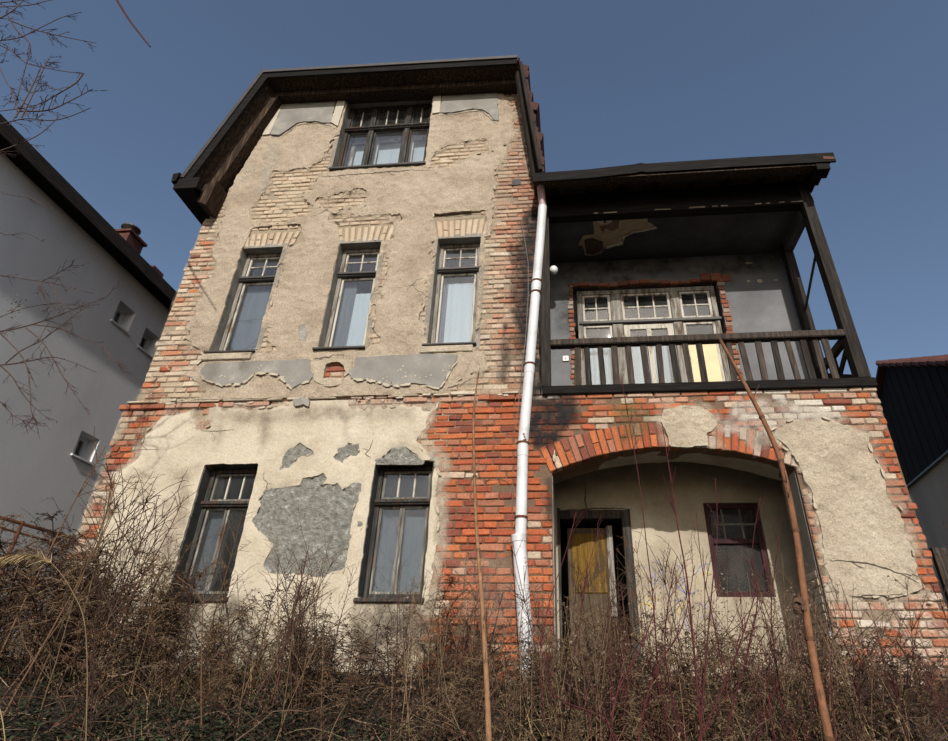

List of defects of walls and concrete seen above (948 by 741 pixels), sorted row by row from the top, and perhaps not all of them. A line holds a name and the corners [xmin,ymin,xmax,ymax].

flaking render [51,199,314,606]
peeling [252,473,368,579]
flaking render [244,137,403,353]
flaking render [323,94,948,687]